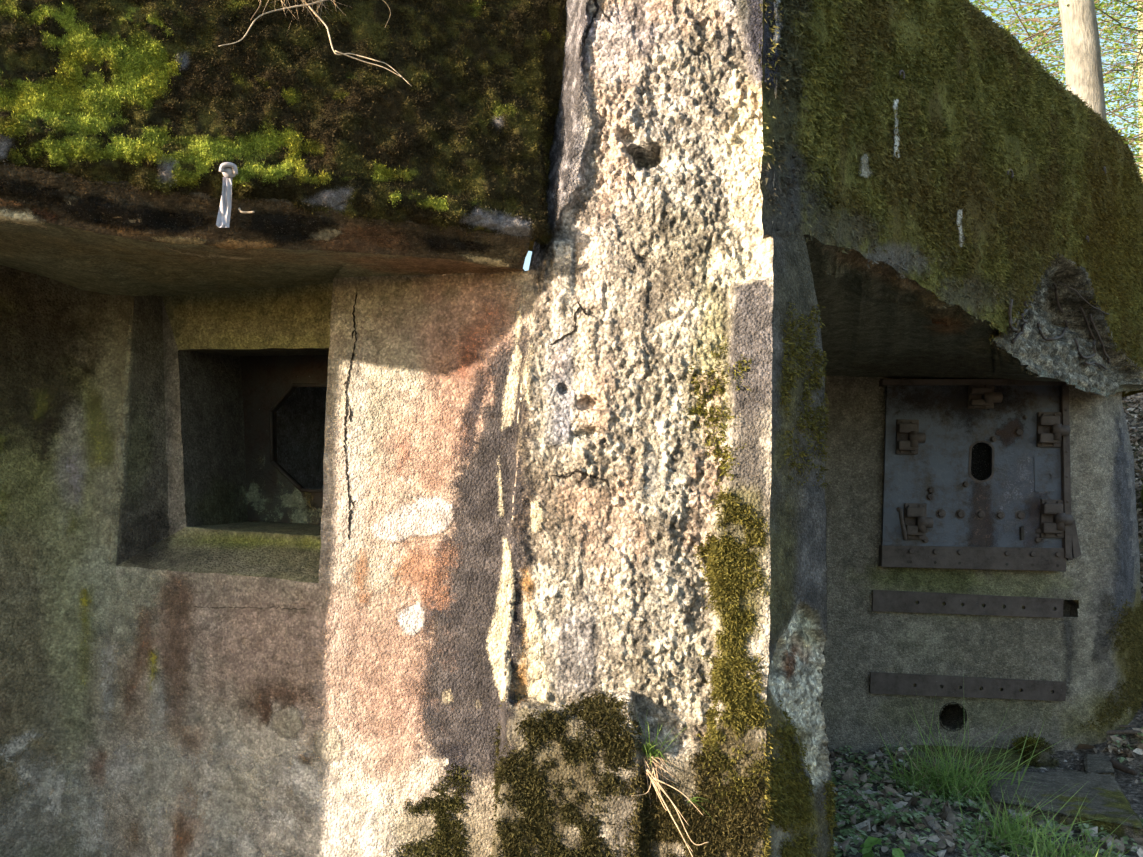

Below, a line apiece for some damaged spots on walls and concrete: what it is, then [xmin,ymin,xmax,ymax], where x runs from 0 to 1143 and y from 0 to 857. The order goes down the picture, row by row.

crack [579,0,613,59]
crack [342,289,358,541]
spalling [1006,253,1143,397]
water stain [417,297,549,798]